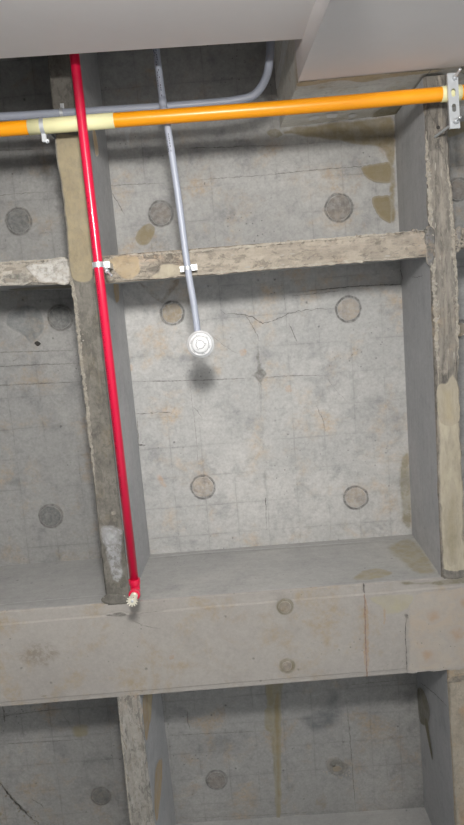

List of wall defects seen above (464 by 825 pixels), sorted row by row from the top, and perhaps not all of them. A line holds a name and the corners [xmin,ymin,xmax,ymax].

leakage [266,106,402,225]
crack [132,270,420,530]
leakage [437,379,460,426]
leakage [143,694,153,742]
leakage [262,683,285,818]
leakage [417,685,433,760]
crack [0,783,51,825]